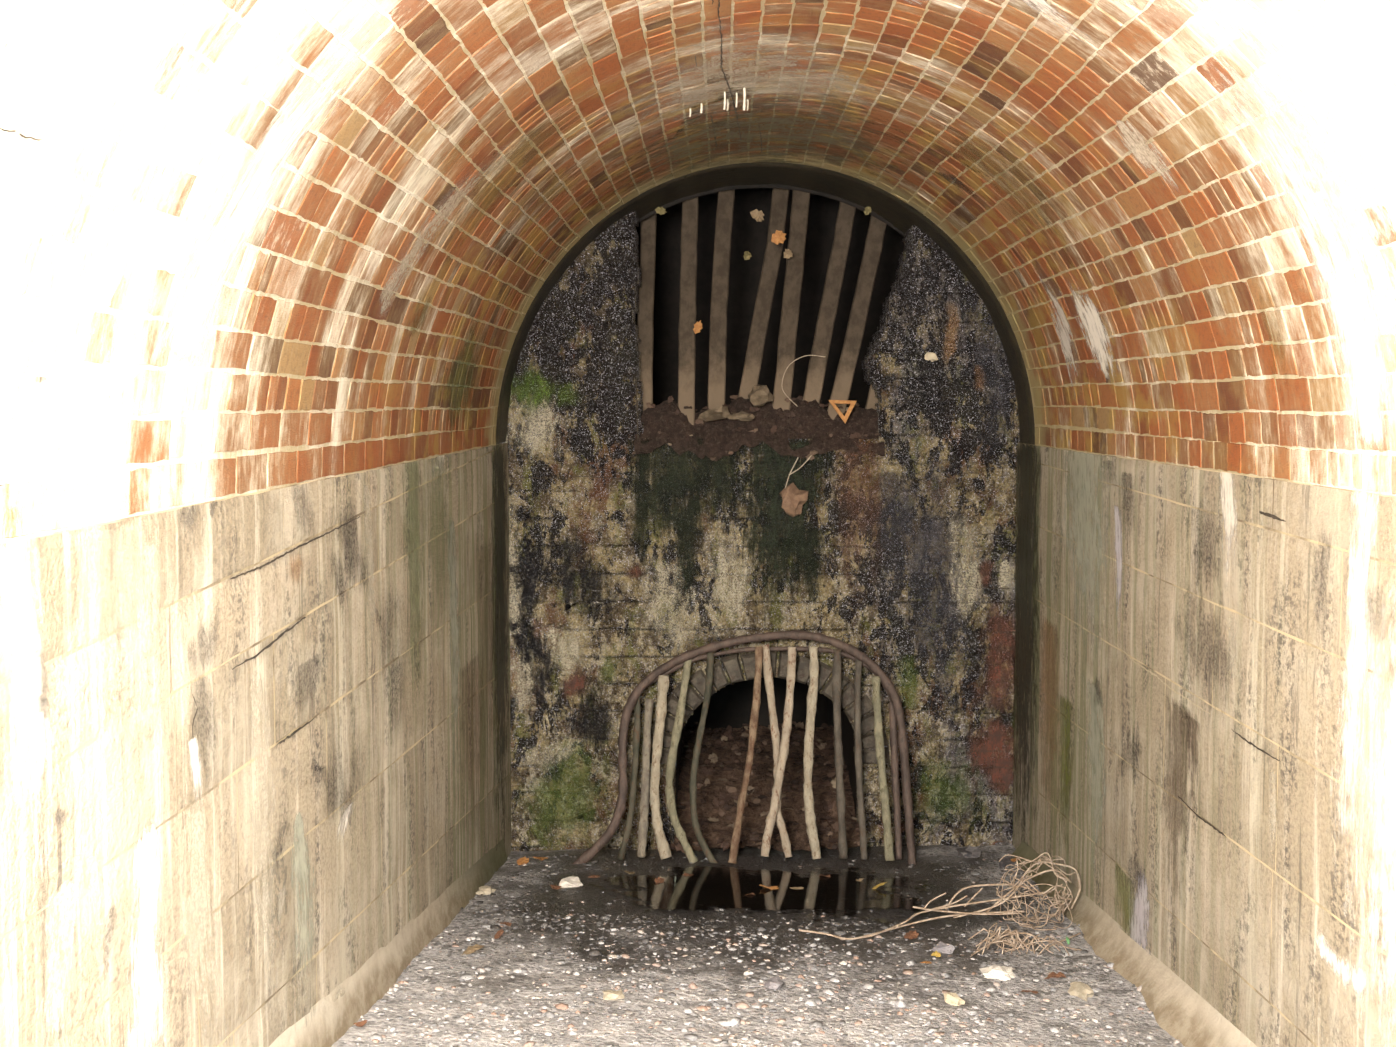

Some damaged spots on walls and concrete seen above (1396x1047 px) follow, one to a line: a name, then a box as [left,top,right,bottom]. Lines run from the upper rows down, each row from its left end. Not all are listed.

crack [695,0,763,152]
leakage [491,34,1042,850]
crack [230,516,360,579]
crack [232,617,306,670]
crack [277,718,314,745]
leakage [1165,705,1194,867]
crack [1114,642,1280,761]
crack [1180,798,1226,837]
leakage [128,825,165,1047]